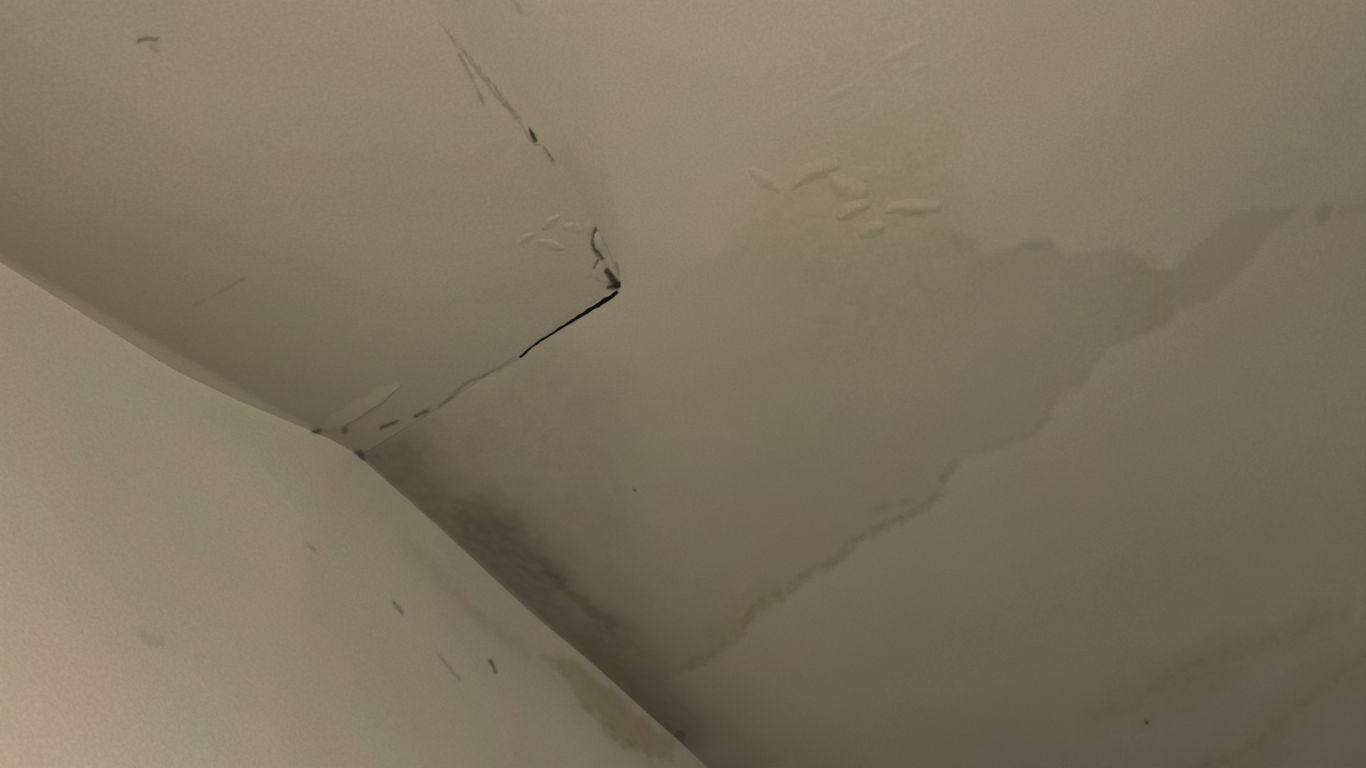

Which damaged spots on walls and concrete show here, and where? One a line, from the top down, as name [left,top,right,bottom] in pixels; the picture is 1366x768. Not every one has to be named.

crack [519,227,621,358]